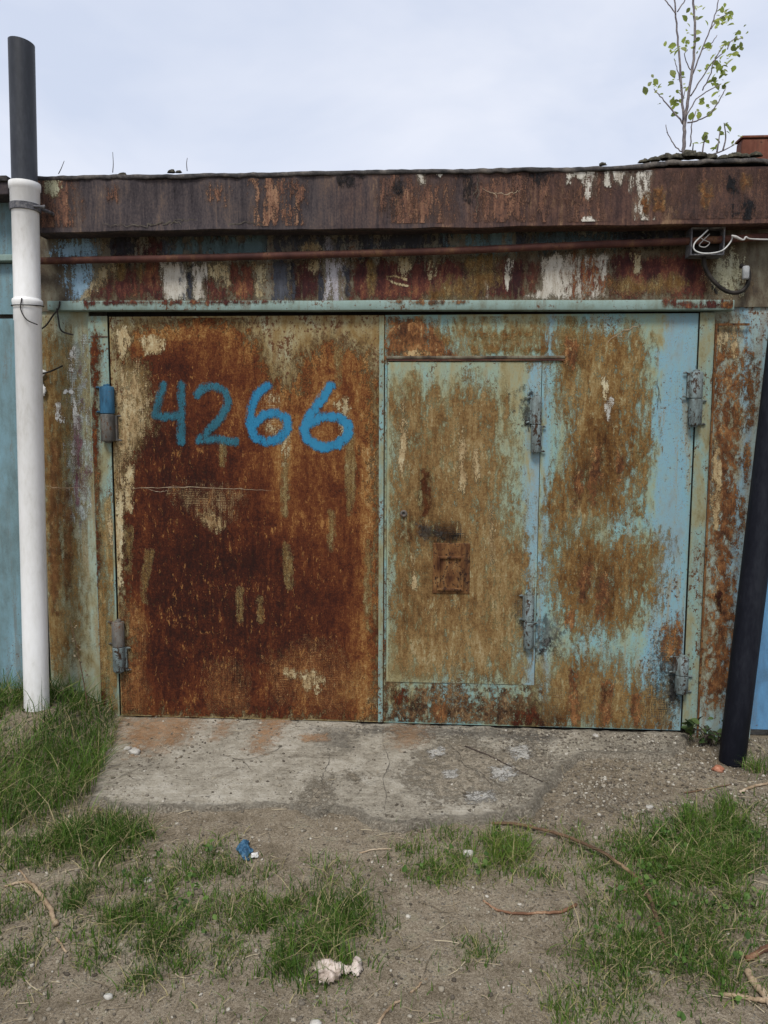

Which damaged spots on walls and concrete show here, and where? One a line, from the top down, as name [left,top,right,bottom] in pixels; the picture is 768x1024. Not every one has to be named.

rust [38,180,85,228]
rust [247,178,309,226]
rust [376,173,613,223]
rust [647,169,768,220]
peeling [49,238,102,301]
peeling [159,261,267,301]
peeling [521,249,621,300]
peeling [702,245,753,300]
peeling [601,376,614,421]
rust [42,236,684,760]
rust [603,250,761,720]